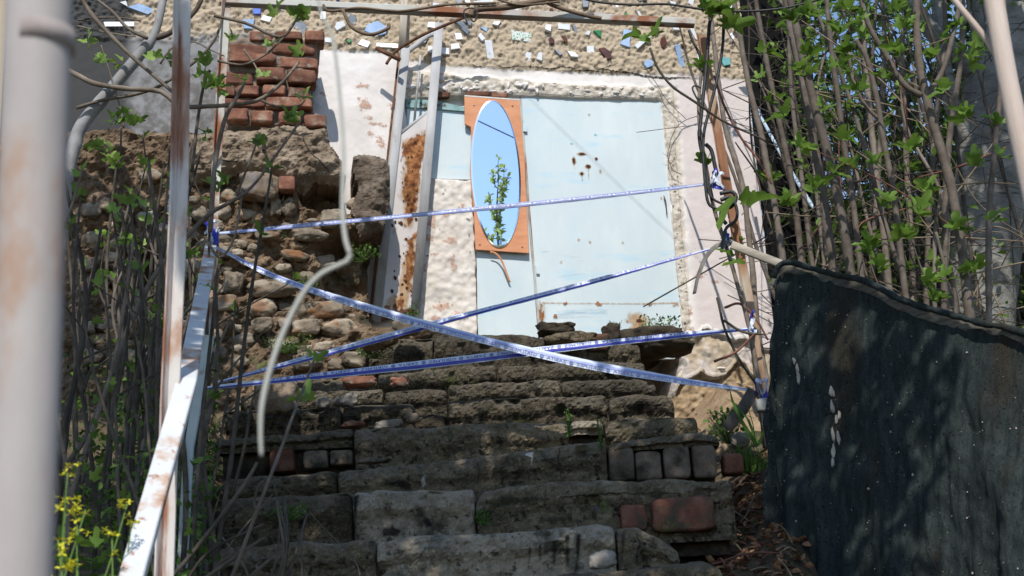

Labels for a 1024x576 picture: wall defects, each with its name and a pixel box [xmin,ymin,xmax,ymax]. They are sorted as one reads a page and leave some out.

peeling [356,83,387,147]
rust [384,133,425,312]